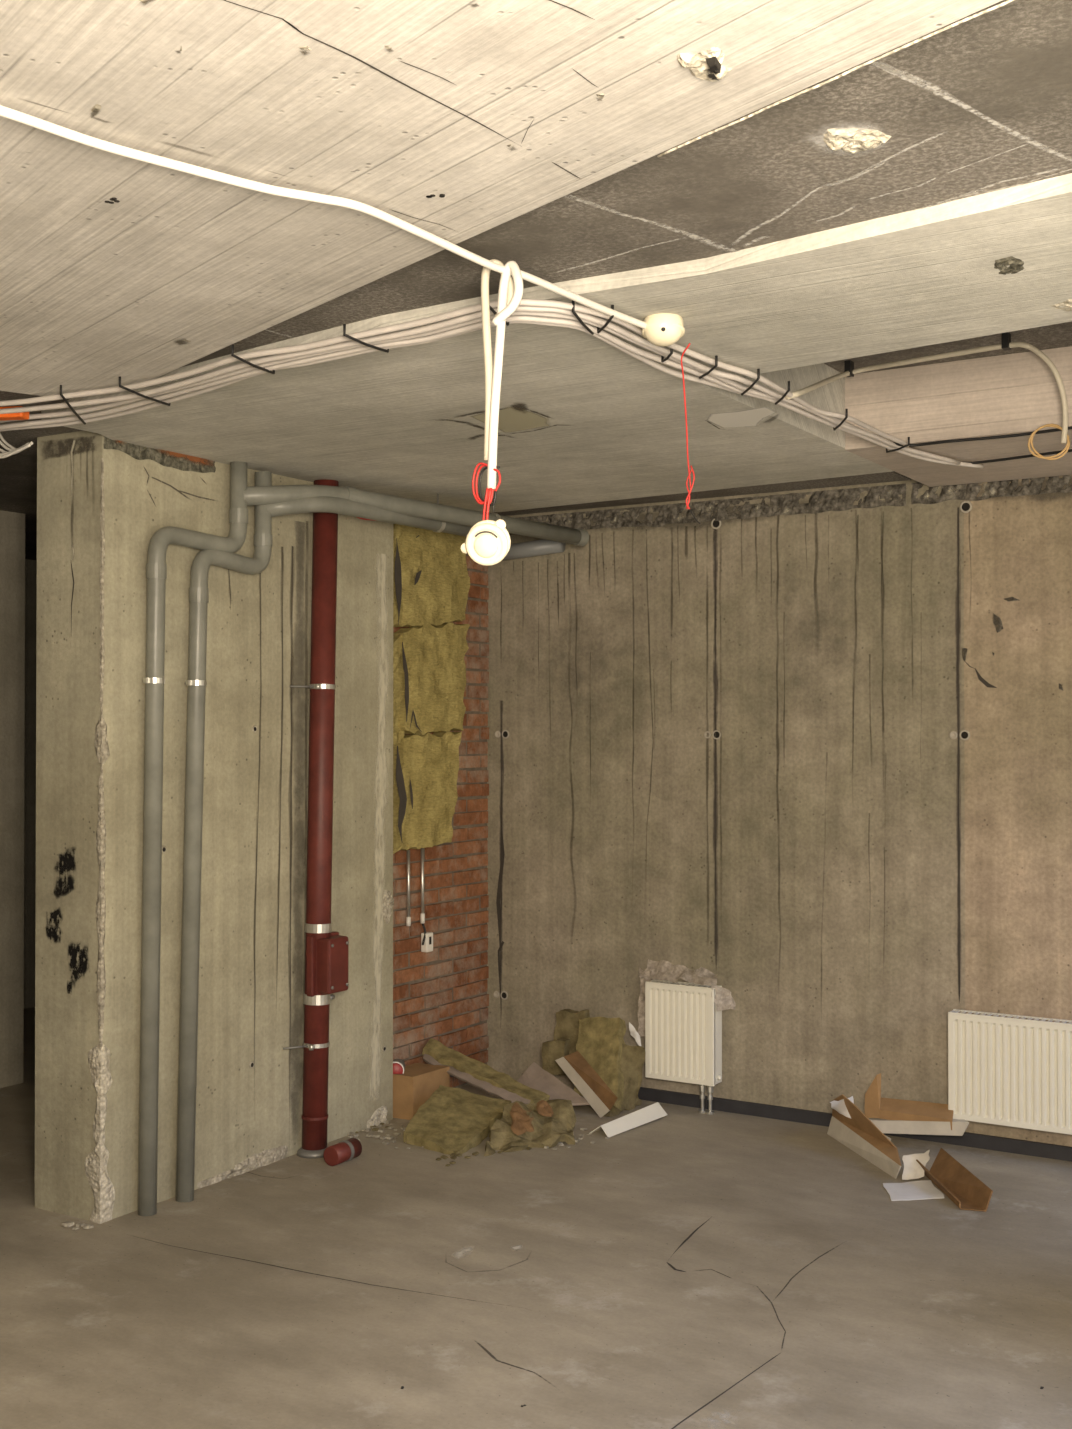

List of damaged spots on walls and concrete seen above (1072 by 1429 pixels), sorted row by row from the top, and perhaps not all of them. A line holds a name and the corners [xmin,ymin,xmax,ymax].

crack [224,0,533,144]
spalling [677,46,732,82]
spalling [822,127,892,154]
spalling [84,458,115,1224]
crack [142,1238,474,1301]
crack [667,1219,730,1278]
crack [761,1248,834,1348]
crack [477,1343,547,1381]